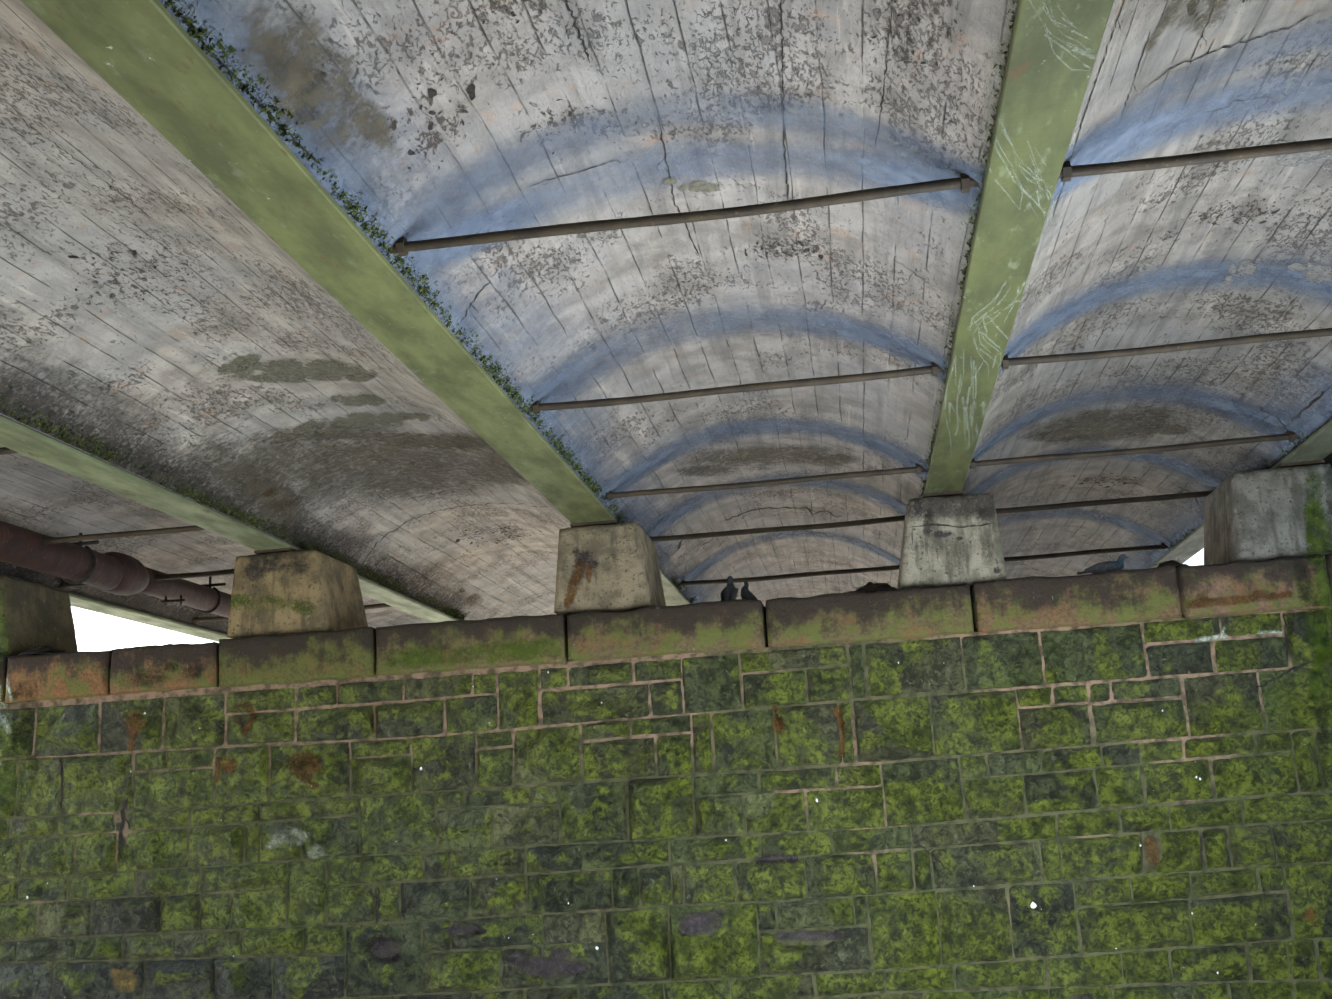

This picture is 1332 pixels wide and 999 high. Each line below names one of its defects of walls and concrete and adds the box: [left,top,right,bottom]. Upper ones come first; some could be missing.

water stain [1145,0,1227,52]
water stain [159,0,1204,569]
water stain [0,359,467,617]
water stain [0,561,249,654]
corrosion [564,561,592,607]
water stain [669,531,900,604]
water stain [1304,501,1332,700]